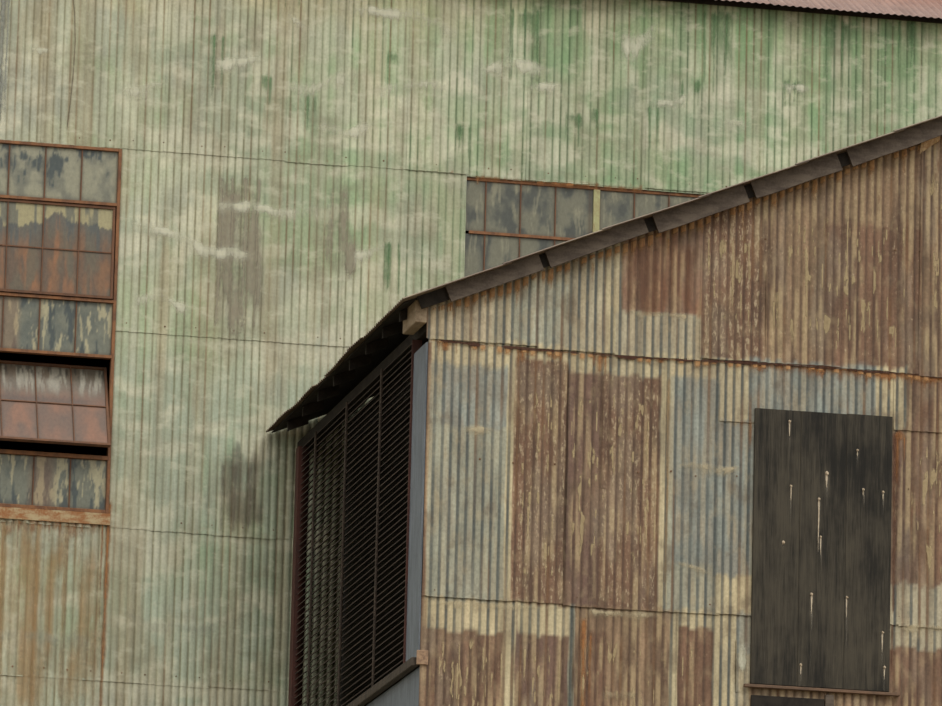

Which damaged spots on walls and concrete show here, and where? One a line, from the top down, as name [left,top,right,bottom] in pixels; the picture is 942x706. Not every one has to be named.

leakage [359,6,401,19]
leakage [623,36,651,56]
leakage [216,57,255,70]
leakage [516,60,539,73]
leakage [326,191,371,274]
leakage [193,178,292,332]
corrosion [433,340,485,350]
corrosion [497,345,942,382]
corrosion [49,504,111,697]